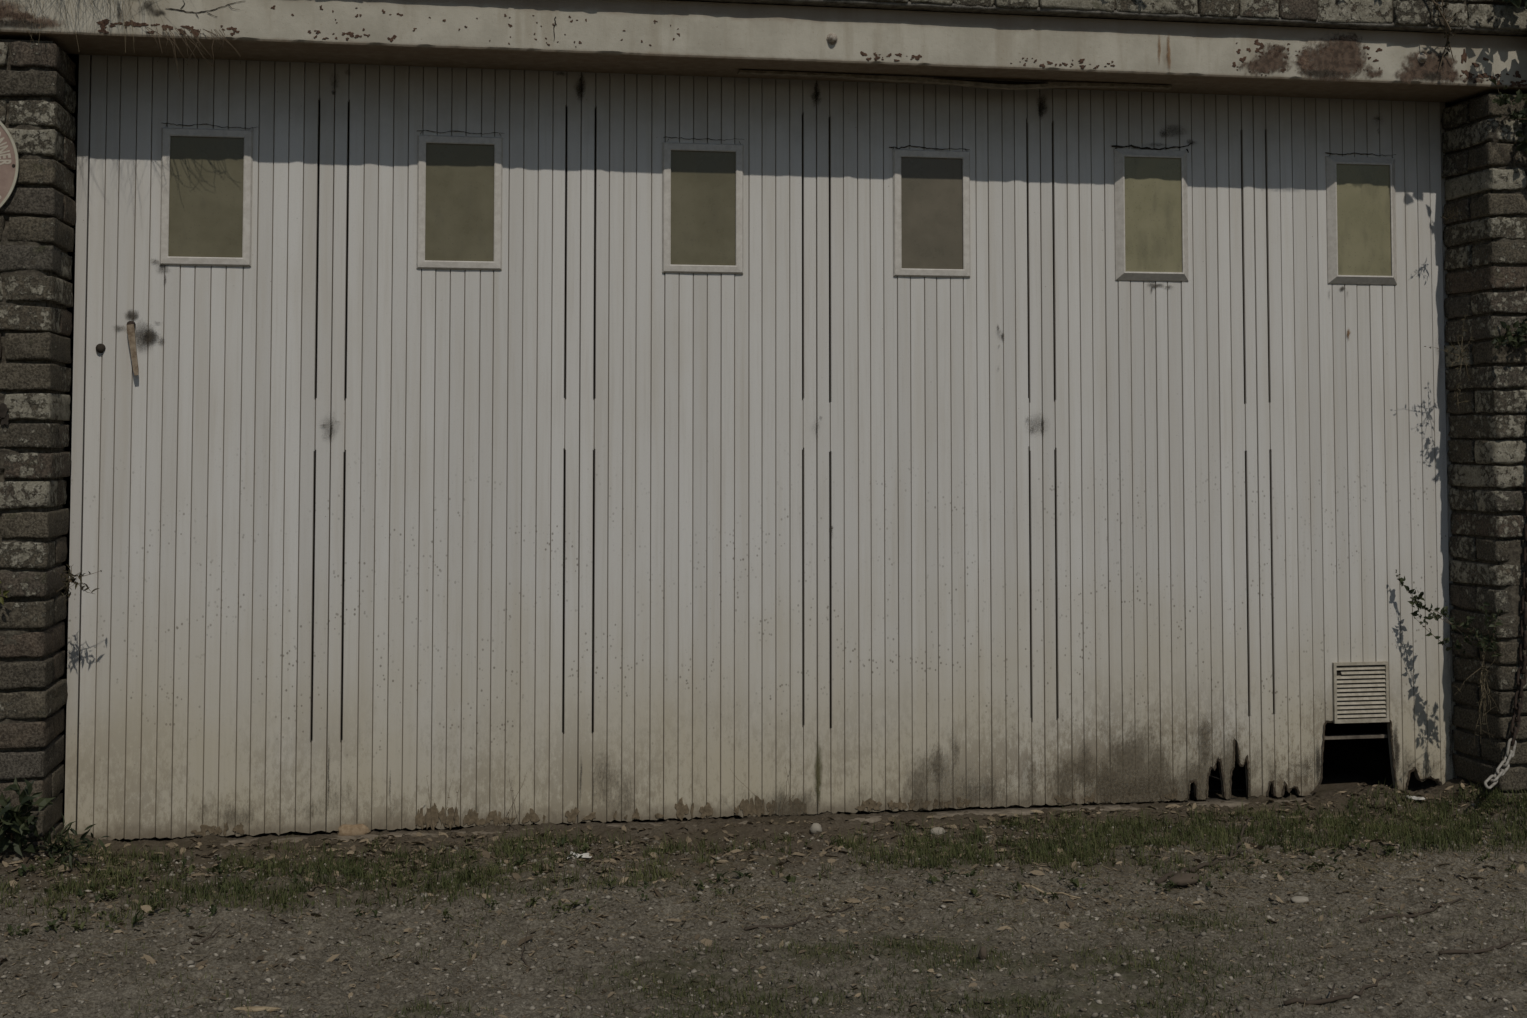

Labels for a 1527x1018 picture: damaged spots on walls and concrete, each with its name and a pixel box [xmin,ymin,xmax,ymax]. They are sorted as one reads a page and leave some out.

corrosion [1240,34,1483,83]
water stain [775,756,821,816]
water stain [1054,723,1251,804]